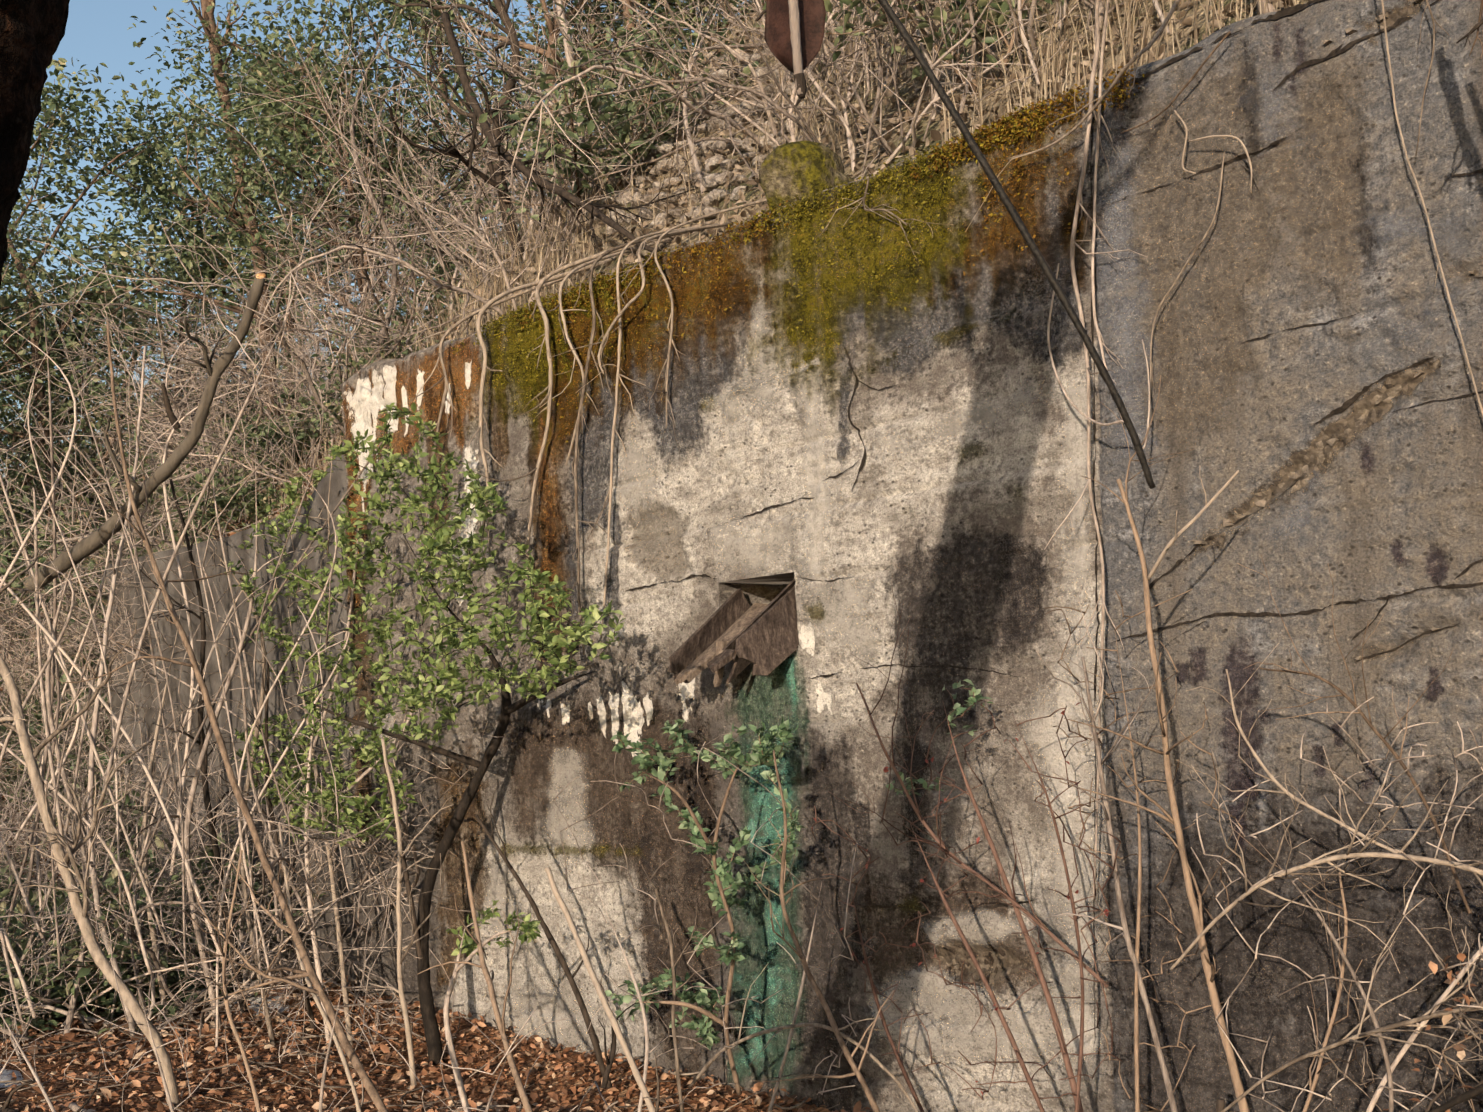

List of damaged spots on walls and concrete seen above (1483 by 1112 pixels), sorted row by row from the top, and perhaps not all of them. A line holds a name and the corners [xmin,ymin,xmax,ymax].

corrosion [341,323,580,841]
leakage [498,130,1483,1112]
crack [1091,292,1483,828]
spalling [1149,356,1441,590]
crack [1091,873,1099,1053]